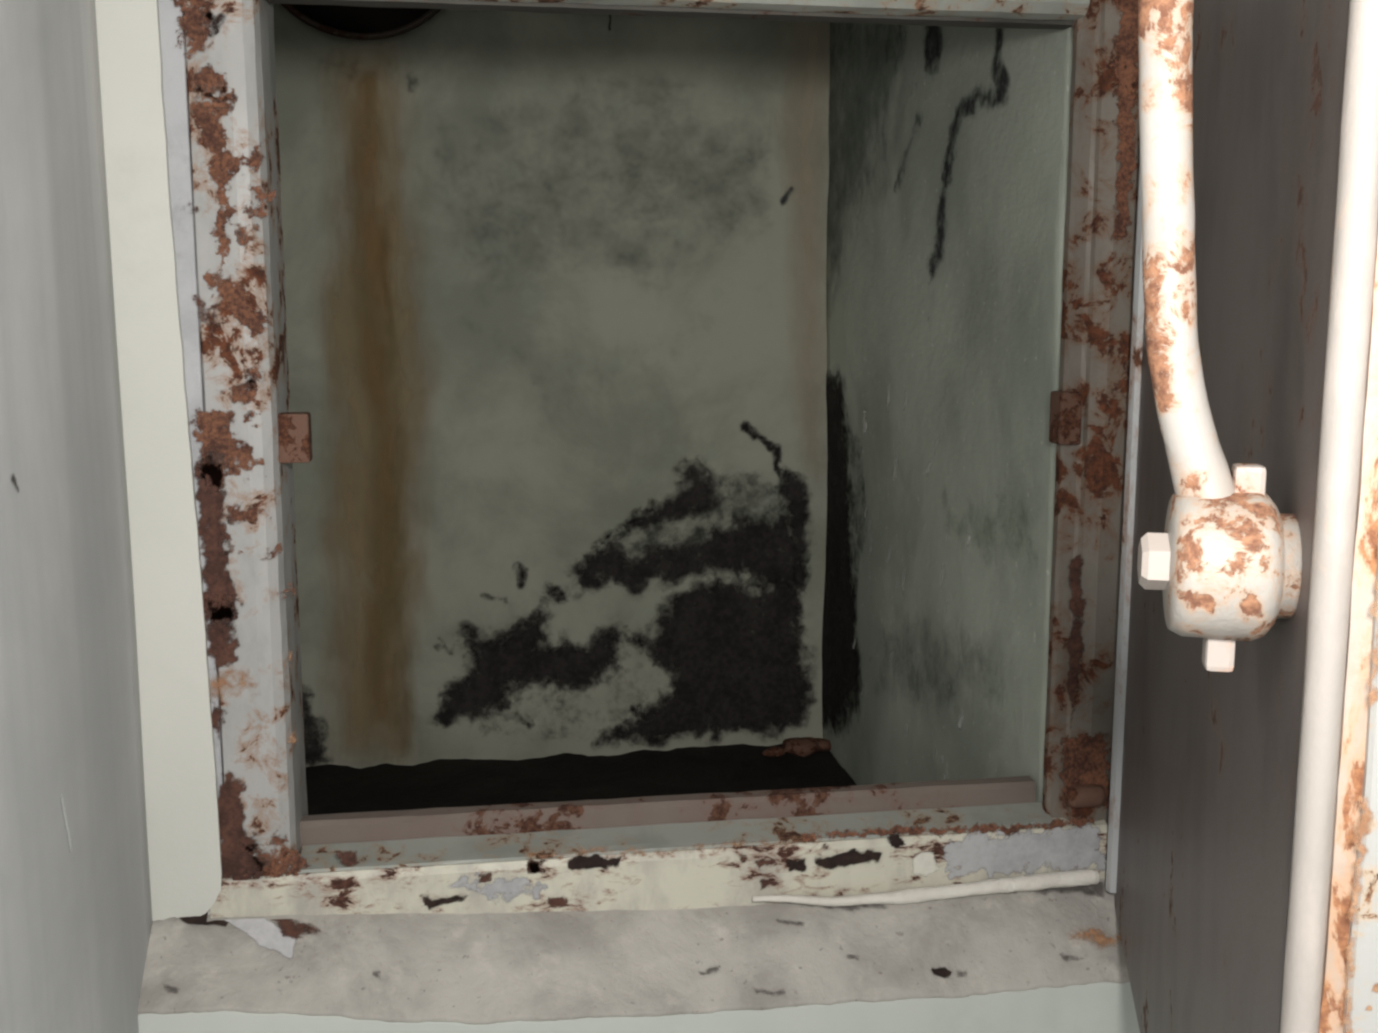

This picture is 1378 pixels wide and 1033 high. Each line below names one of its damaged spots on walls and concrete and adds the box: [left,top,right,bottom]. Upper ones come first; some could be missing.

rust [1109,0,1139,242]
rust [173,0,276,736]
water stain [434,374,864,747]
rust [218,772,309,881]
rust [336,851,359,867]
rust [420,847,660,910]
rust [732,555,1112,889]
peeling [752,852,1099,906]